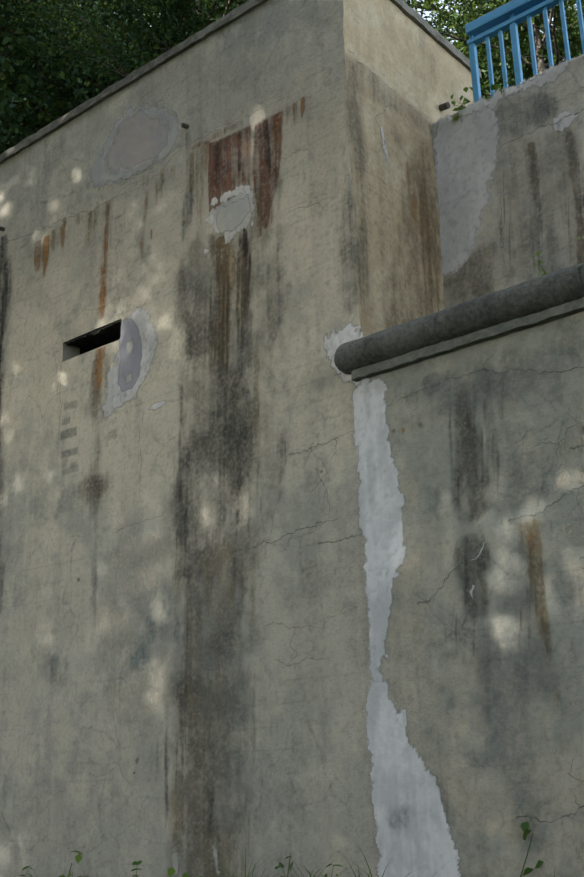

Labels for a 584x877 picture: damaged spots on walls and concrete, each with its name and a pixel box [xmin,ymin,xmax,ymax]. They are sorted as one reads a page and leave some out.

leakage [0,237,11,363]
corrosion [99,204,109,316]
peeling [205,184,250,225]
corrosion [215,228,251,369]
corrosion [190,97,305,236]
leakage [528,142,542,229]
leakage [566,131,584,264]
crack [396,357,584,404]
crack [508,407,584,522]
leakage [456,538,488,618]
corrosion [526,520,549,652]
crack [516,758,584,823]